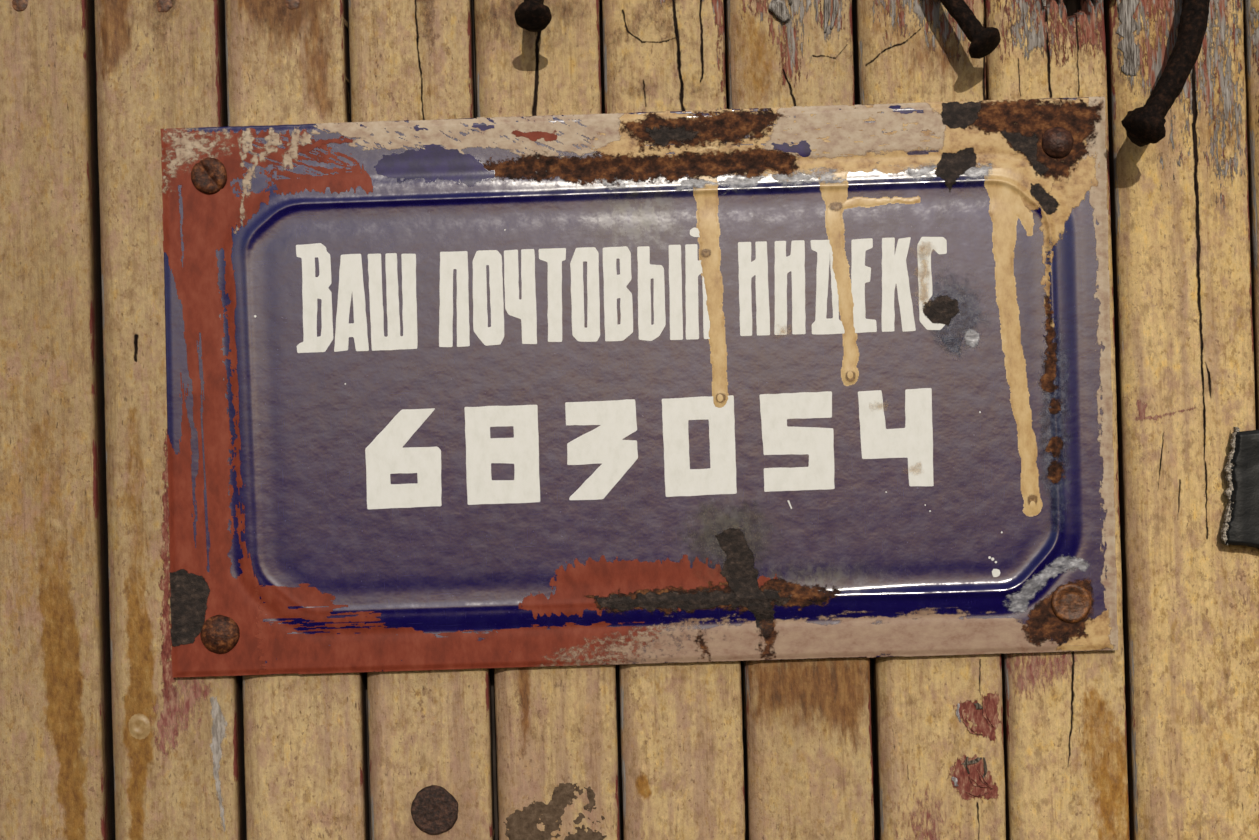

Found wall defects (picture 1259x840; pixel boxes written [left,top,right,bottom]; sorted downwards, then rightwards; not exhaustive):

crack [622,0,704,111]
peeling [702,0,731,110]
peeling [741,0,971,87]
peeling [964,0,1182,106]
peeling [1157,0,1259,208]
crack [1158,65,1211,539]
leakage [21,417,92,840]
leakage [117,403,161,840]
peeling [953,693,1002,741]
peeling [1006,651,1076,700]
peeling [504,783,607,840]
peeling [949,754,999,801]